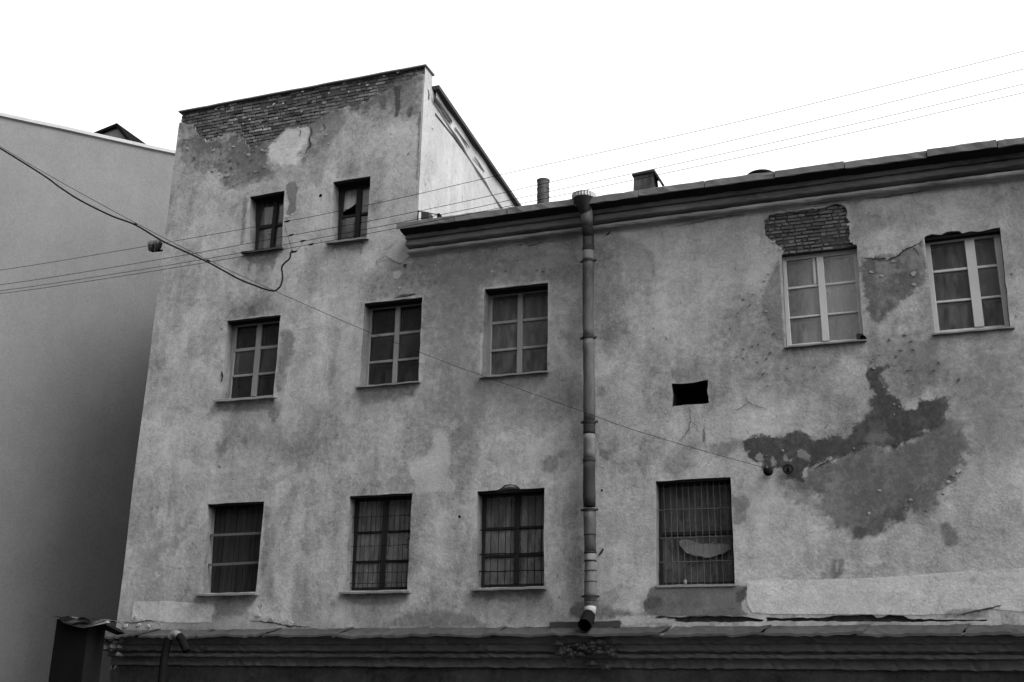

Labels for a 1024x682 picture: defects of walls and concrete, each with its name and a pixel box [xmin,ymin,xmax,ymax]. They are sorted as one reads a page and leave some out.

flaking render [180,68,425,186]
flaking render [733,204,857,387]
flaking render [860,249,926,323]
crack [867,241,922,260]
flaking render [619,585,987,626]